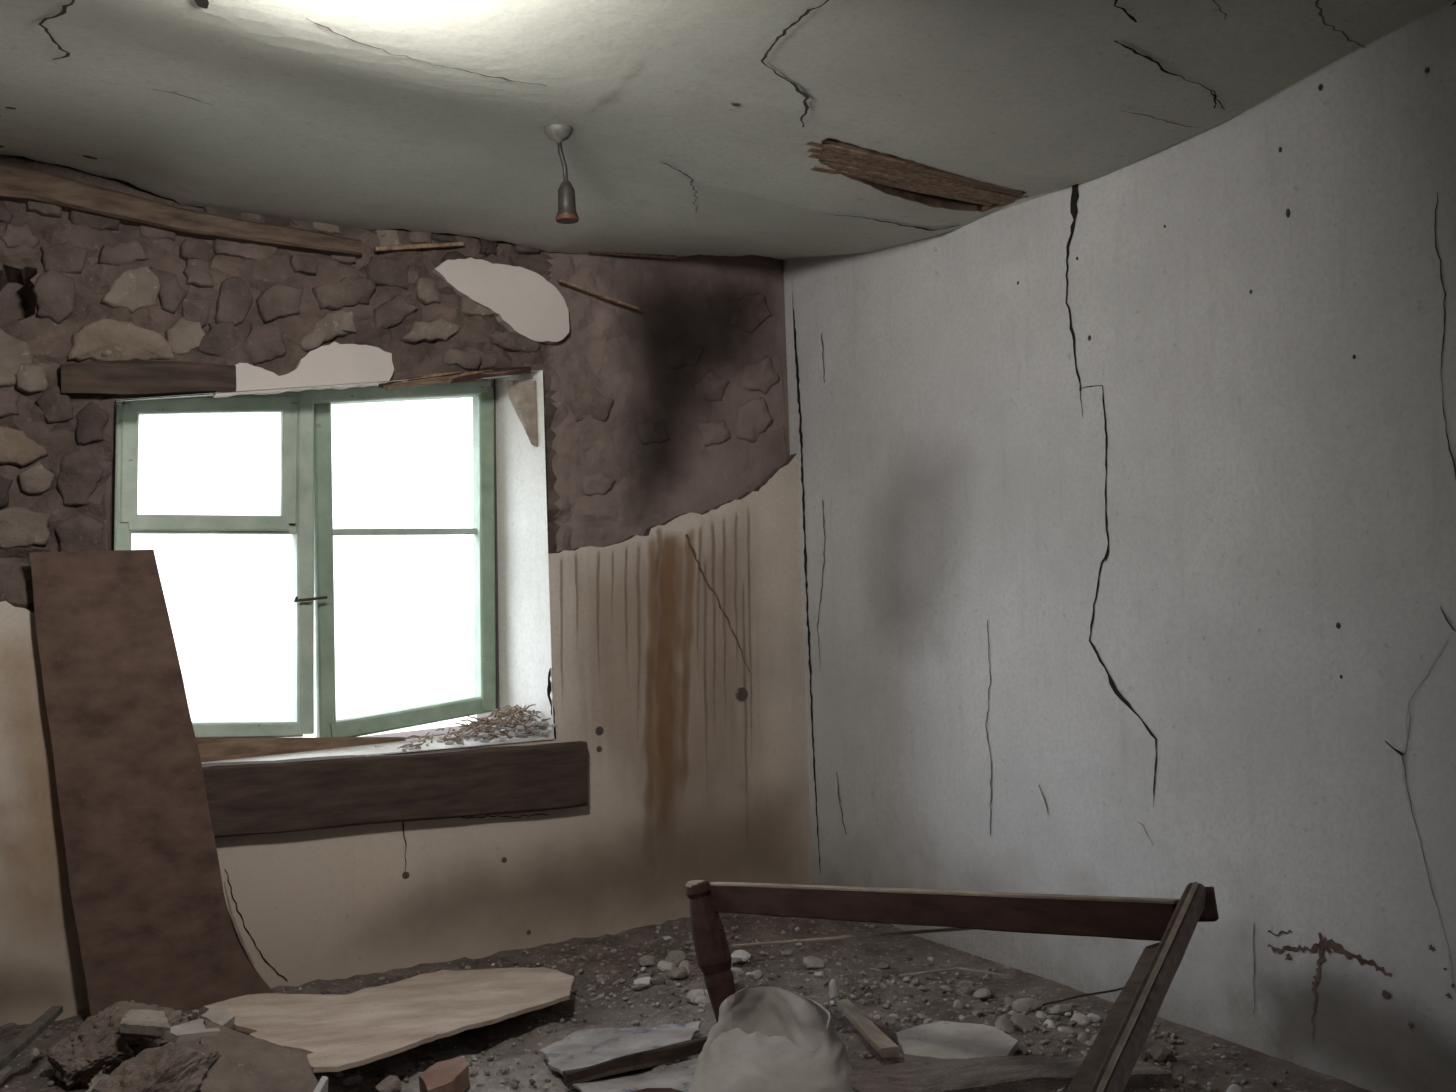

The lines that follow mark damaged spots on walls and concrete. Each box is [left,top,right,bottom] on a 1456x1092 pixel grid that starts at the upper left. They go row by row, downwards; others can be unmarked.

crack [38,0,75,60]
crack [194,0,209,9]
crack [760,0,829,127]
crack [1114,0,1226,127]
flaking render [0,145,790,612]
crack [1434,192,1456,479]
crack [1065,184,1157,845]